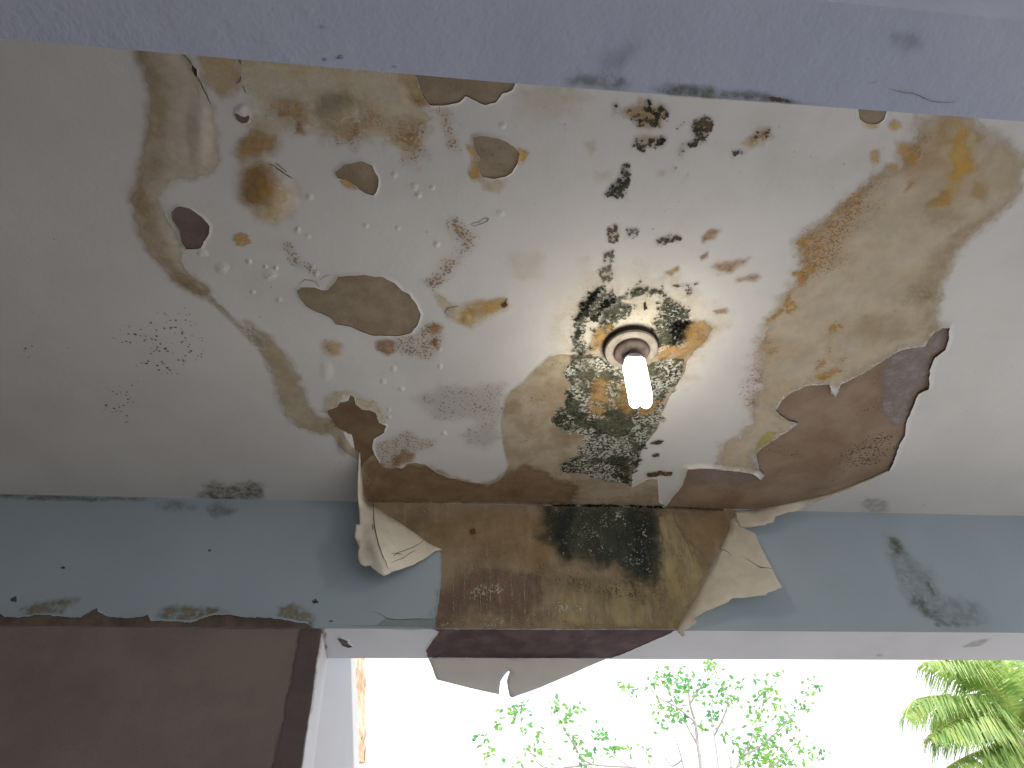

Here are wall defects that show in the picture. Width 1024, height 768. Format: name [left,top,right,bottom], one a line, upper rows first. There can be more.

peeling [415,75,519,109]
water stain [132,51,429,311]
peeling [470,132,521,181]
mould [605,163,631,199]
mould [614,99,669,153]
peeling [168,203,214,252]
peeling [293,271,425,338]
water stain [717,115,1024,471]
mould [551,225,708,486]
peeling [324,320,956,698]
mould [536,504,707,609]
peeling [0,606,313,628]